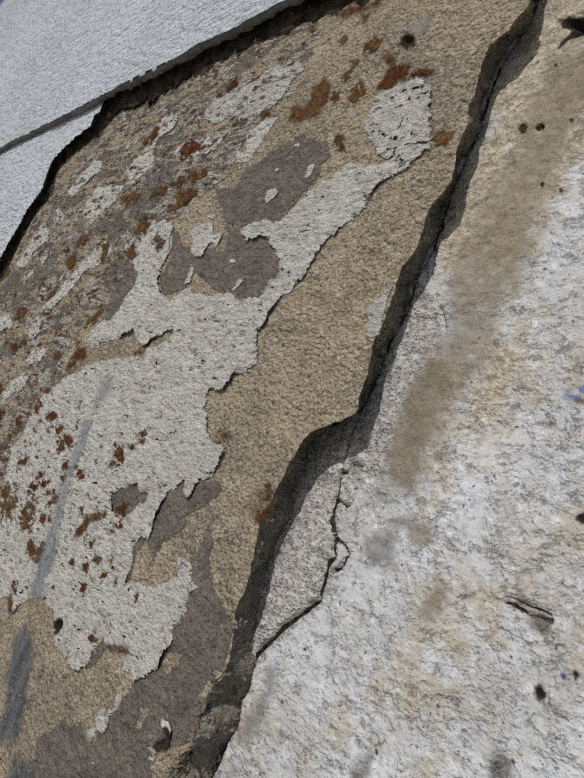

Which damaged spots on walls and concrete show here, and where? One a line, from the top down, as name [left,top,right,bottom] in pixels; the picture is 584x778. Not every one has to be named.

corrosion [288,34,435,123]
crack [482,39,520,121]
corrosion [334,133,345,151]
corrosion [430,127,455,152]
crack [409,141,475,309]
corrosion [0,24,322,595]
crack [375,341,392,384]
crack [256,408,364,660]
corrosion [88,629,129,655]
crack [505,596,553,630]
crack [169,717,201,778]
crack [216,745,227,772]